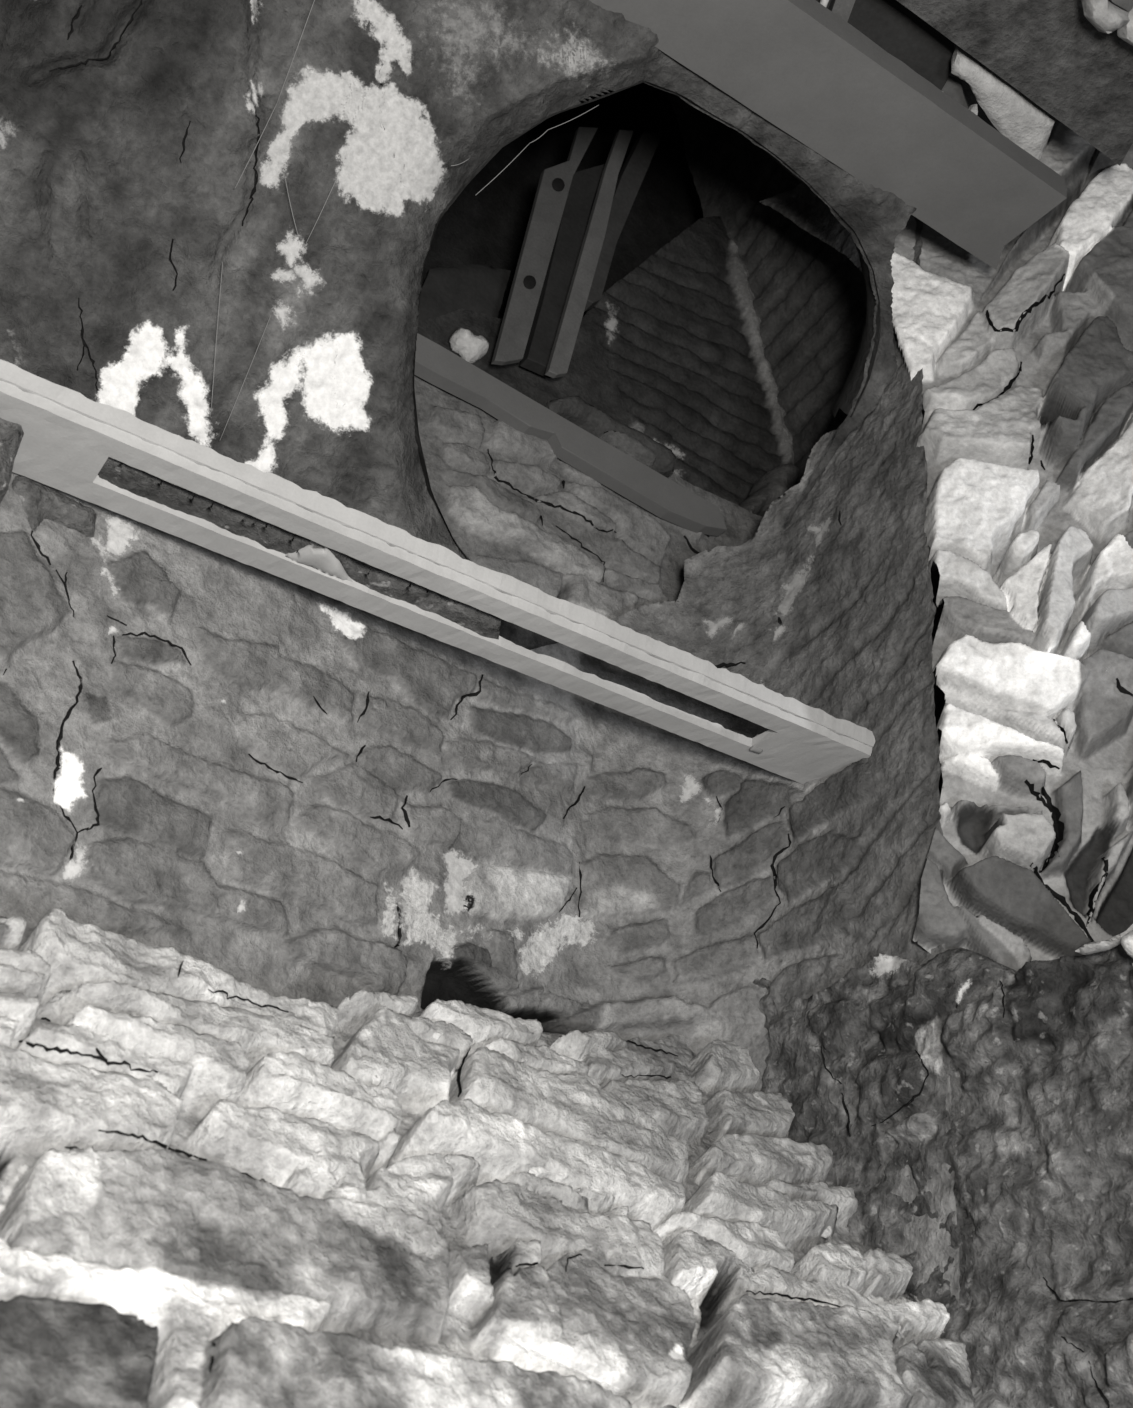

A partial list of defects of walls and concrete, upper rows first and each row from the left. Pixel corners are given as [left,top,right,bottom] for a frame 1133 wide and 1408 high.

crack [31,531,191,861]
crack [450,675,483,720]
water stain [53,746,87,812]
water stain [378,848,600,979]
crack [1043,1277,1133,1303]
crack [1061,1336,1110,1408]